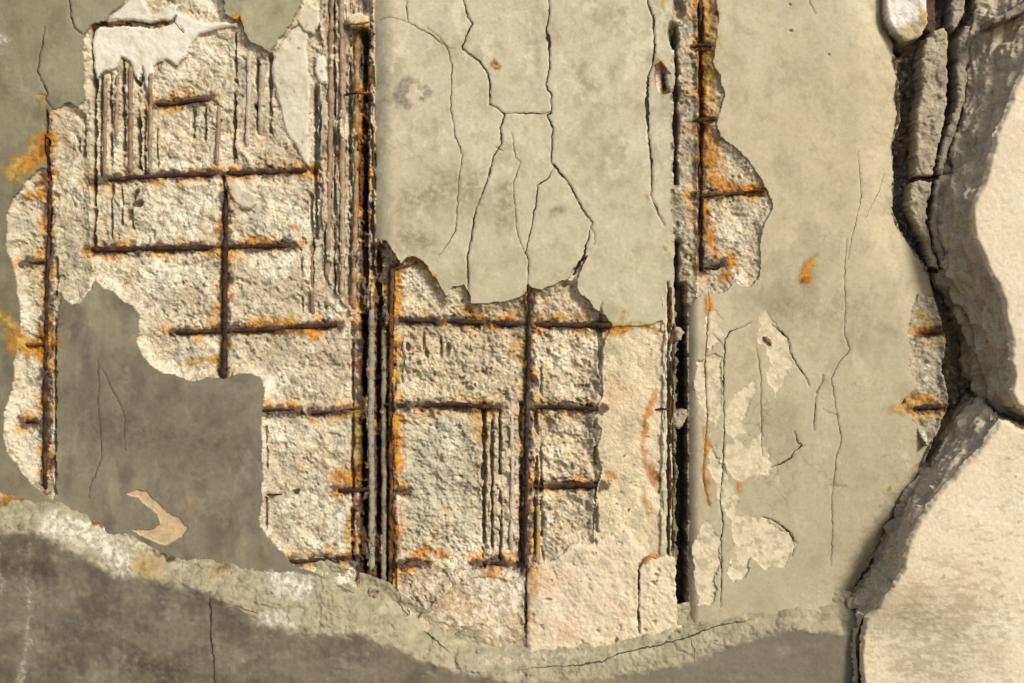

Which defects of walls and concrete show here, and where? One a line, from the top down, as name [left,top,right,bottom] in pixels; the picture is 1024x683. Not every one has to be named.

corrosion [6,131,57,199]
crack [381,0,595,296]
crack [645,0,664,224]
spalling [690,0,773,297]
corrosion [698,0,767,194]
corrosion [0,314,57,358]
spalling [2,0,688,647]
corrosion [332,321,404,574]
corrosion [641,393,656,452]
peeling [689,309,799,606]
crack [756,151,885,557]
crack [846,0,1024,683]